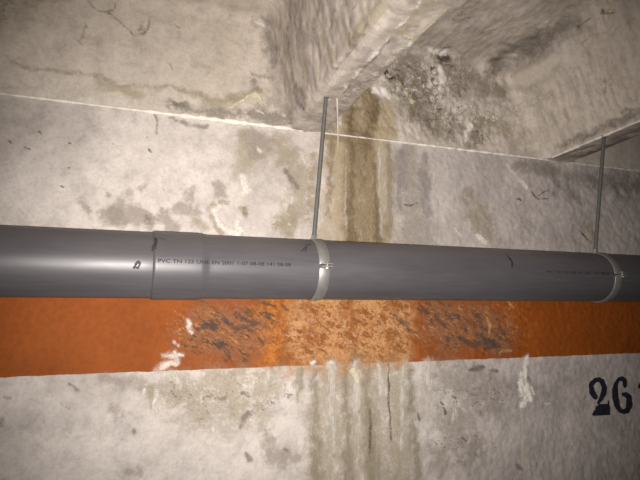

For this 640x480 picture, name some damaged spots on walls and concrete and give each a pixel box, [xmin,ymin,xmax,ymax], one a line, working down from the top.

damp [342,46,552,148]
damp [172,303,286,361]
damp [326,360,377,480]
damp [377,363,391,423]
damp [399,363,413,451]
damp [421,360,503,473]
efflorescence [517,355,535,478]